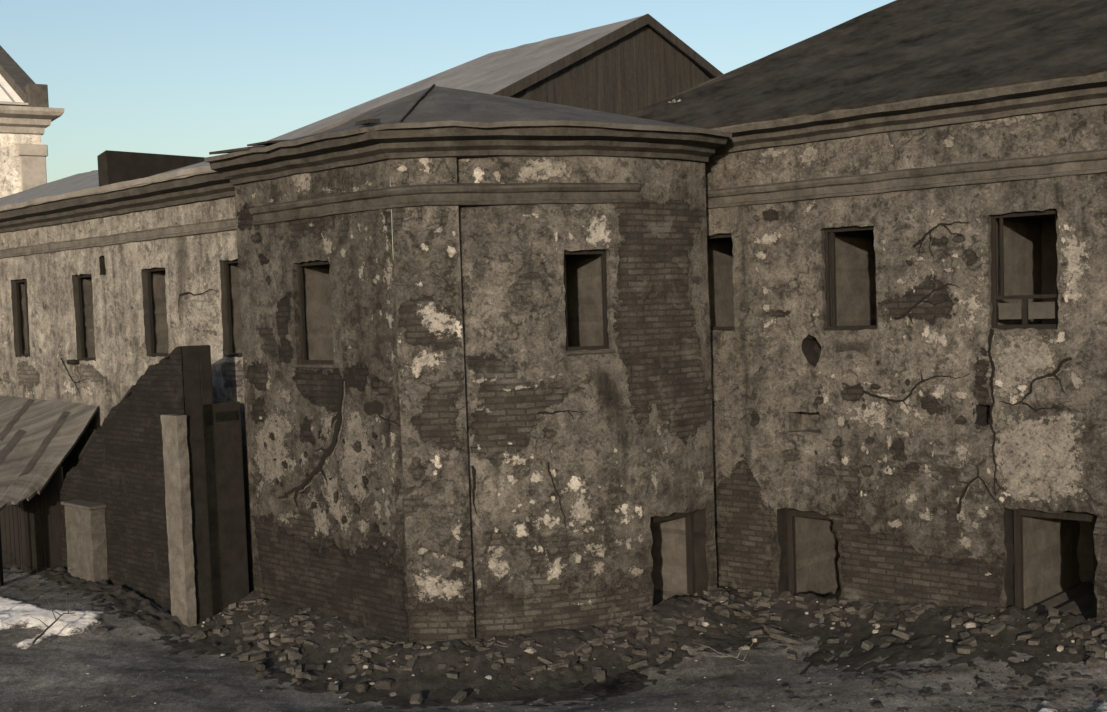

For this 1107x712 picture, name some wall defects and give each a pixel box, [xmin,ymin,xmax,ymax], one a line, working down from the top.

crack [278,379,345,507]
spalling [553,192,712,500]
flaking render [753,207,796,338]
crack [894,221,970,324]
flaking render [801,207,1091,608]
crack [863,329,1075,515]